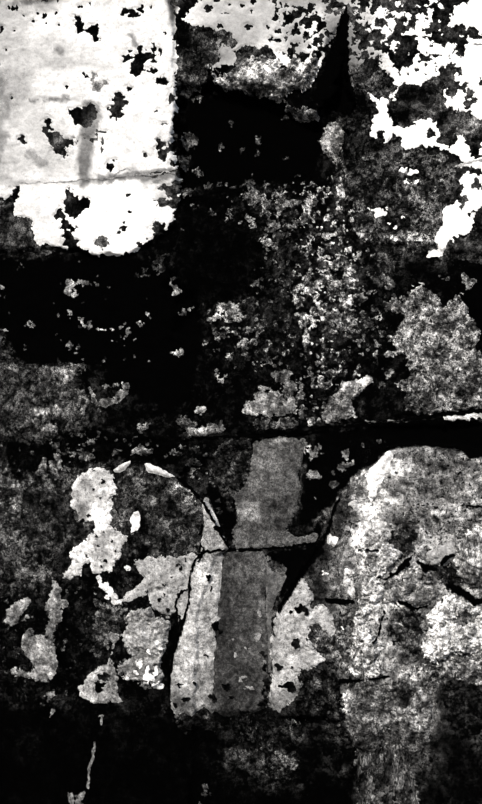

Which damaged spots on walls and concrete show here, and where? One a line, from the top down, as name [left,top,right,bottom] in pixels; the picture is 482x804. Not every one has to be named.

crack [20,167,175,184]
peeling [0,0,482,427]
spalling [0,329,253,718]
peeling [266,556,287,577]
crack [167,477,340,688]
crack [325,597,355,605]
crack [338,675,389,684]